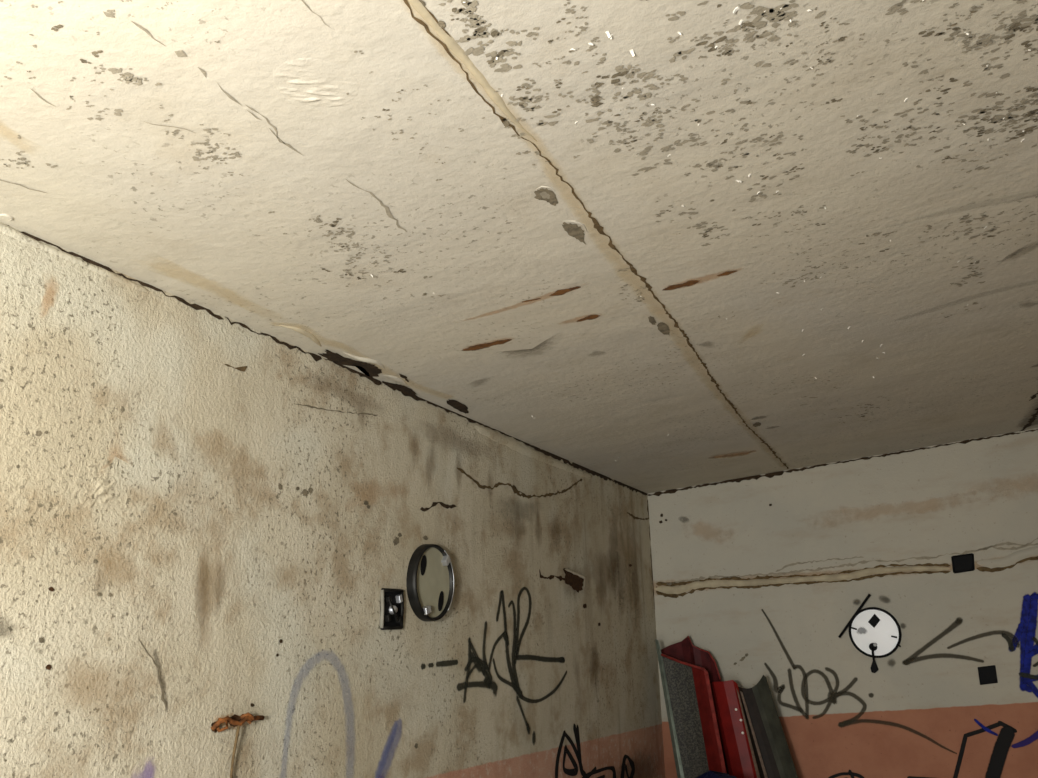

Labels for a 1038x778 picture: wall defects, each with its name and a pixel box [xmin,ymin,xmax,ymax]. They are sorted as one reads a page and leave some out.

crack [103,11,304,156]
crack [346,179,407,232]
crack [0,214,322,362]
corrosion [522,286,580,302]
corrosion [663,280,699,290]
crack [403,0,1038,607]
corrosion [462,339,512,351]
flaking render [275,325,506,436]
crack [296,404,377,416]
spalling [563,568,587,608]